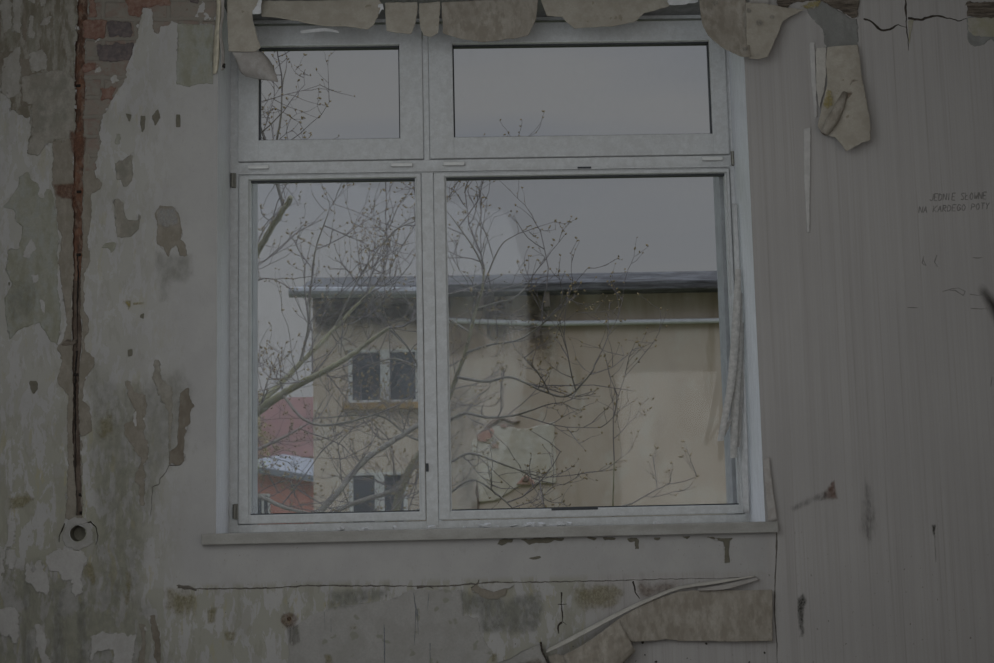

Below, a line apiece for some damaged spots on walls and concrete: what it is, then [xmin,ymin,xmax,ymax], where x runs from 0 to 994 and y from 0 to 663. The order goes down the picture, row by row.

peeling [965,5,994,46]
flaking render [0,0,216,520]
crack [72,256,80,473]
peeling [0,519,88,597]
peeling [0,607,20,644]
peeling [89,615,161,663]
peeling [288,588,493,663]